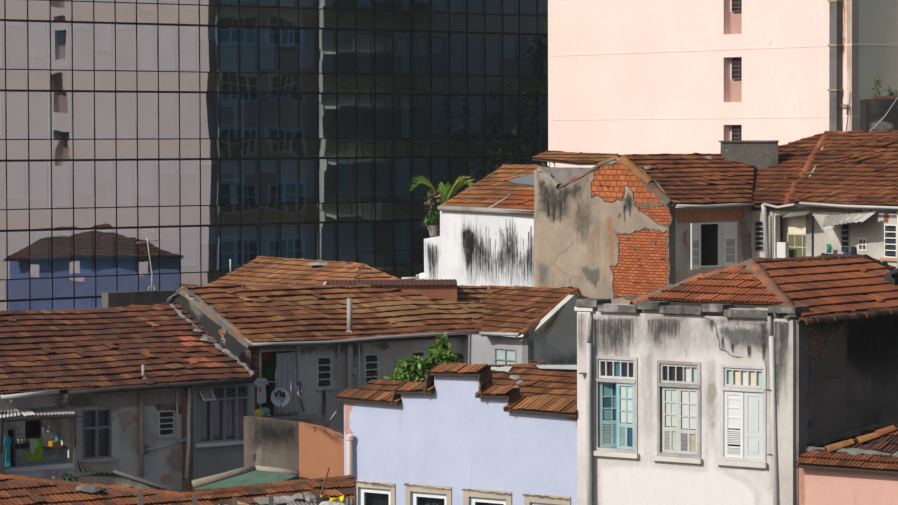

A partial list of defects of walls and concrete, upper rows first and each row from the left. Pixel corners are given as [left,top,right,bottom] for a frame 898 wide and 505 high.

water stain [539,182,581,222]
water stain [425,242,438,278]
water stain [462,221,546,282]
spalling [583,269,599,287]
flaking render [590,160,752,300]
water stain [597,319,630,346]
water stain [760,321,788,391]
water stain [840,315,898,370]